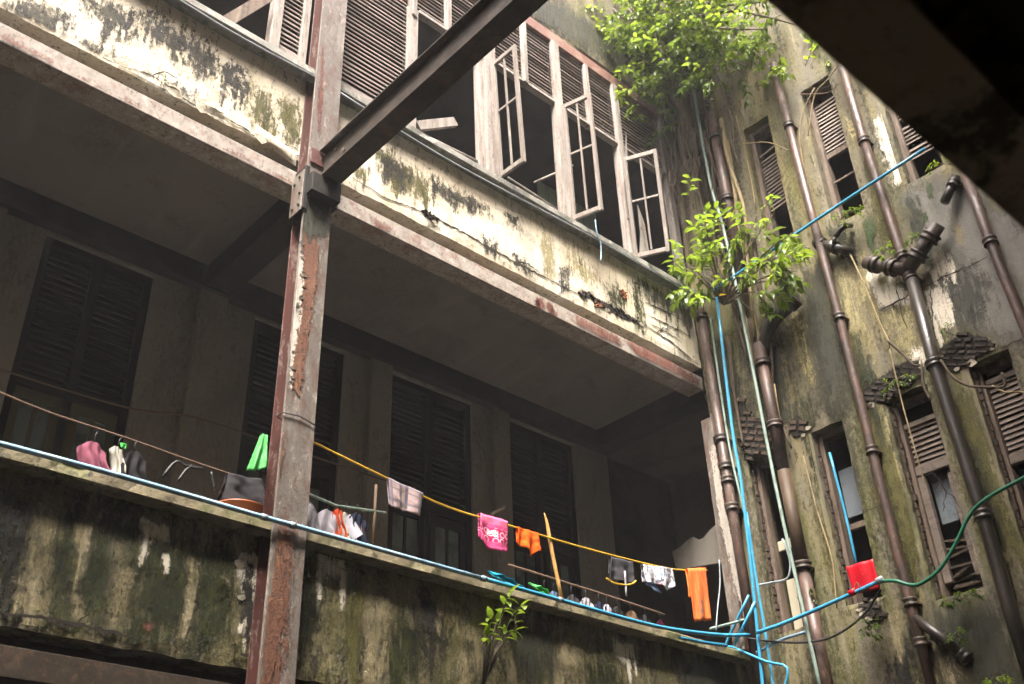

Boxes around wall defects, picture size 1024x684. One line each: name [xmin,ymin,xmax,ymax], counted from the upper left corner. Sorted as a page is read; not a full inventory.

damp [2,0,303,150]
peeling [104,36,268,144]
damp [354,147,518,230]
crack [352,177,578,294]
peeling [419,208,644,326]
damp [483,232,694,337]
peeling [874,115,901,186]
spalling [736,398,812,462]
damp [709,172,1024,600]
spalling [862,346,926,408]
damp [0,474,257,656]
damp [298,556,327,669]